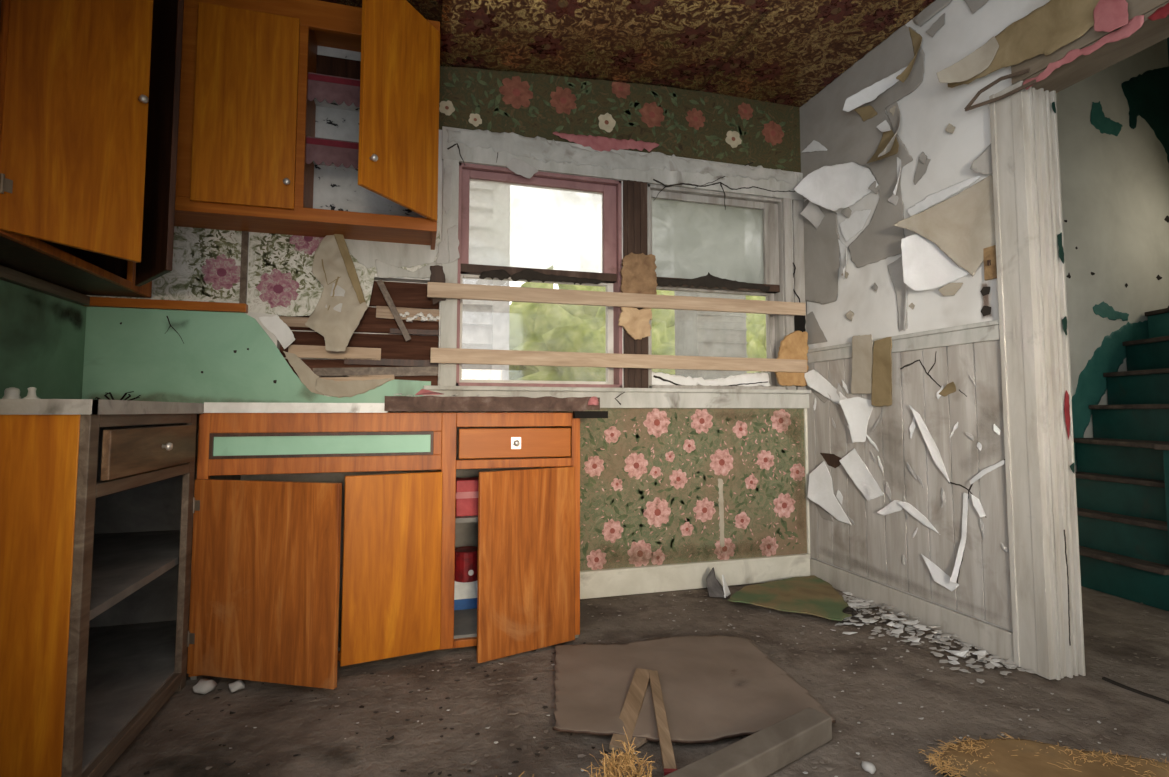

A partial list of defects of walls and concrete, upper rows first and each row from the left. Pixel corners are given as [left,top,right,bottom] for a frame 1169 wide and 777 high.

peeling [1023,3,1169,90]
peeling [446,0,988,280]
crack [653,162,795,210]
peeling [1090,66,1169,163]
flaking render [258,164,460,398]
peeling [794,311,827,345]
peeling [1057,220,1078,279]
peeling [800,231,969,538]
peeling [950,422,982,451]
peeling [921,460,1005,591]